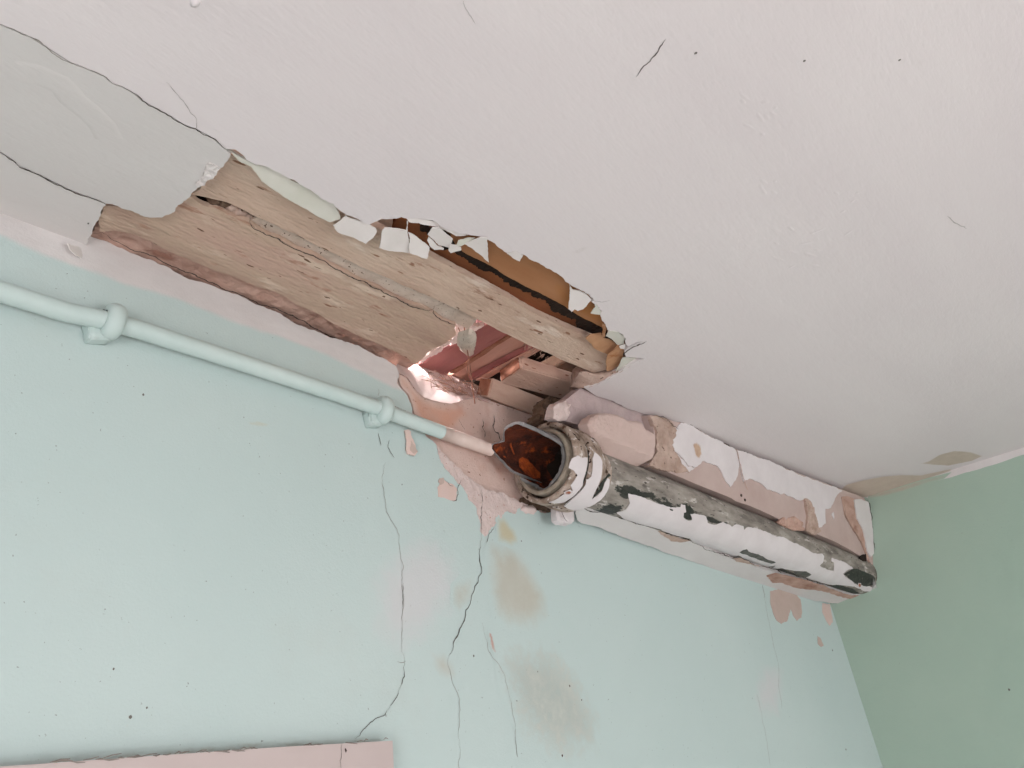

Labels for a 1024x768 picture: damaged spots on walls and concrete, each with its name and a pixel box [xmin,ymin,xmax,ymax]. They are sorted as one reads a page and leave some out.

crack [1,25,225,149]
crack [1,153,106,205]
peeling [333,216,489,262]
peeling [568,284,601,315]
spalling [421,322,484,363]
spalling [437,445,528,537]
rust [502,442,553,481]
peeling [670,503,736,526]
peeling [734,549,859,626]
crack [447,490,518,767]
damp [361,515,607,768]
crack [355,646,406,739]